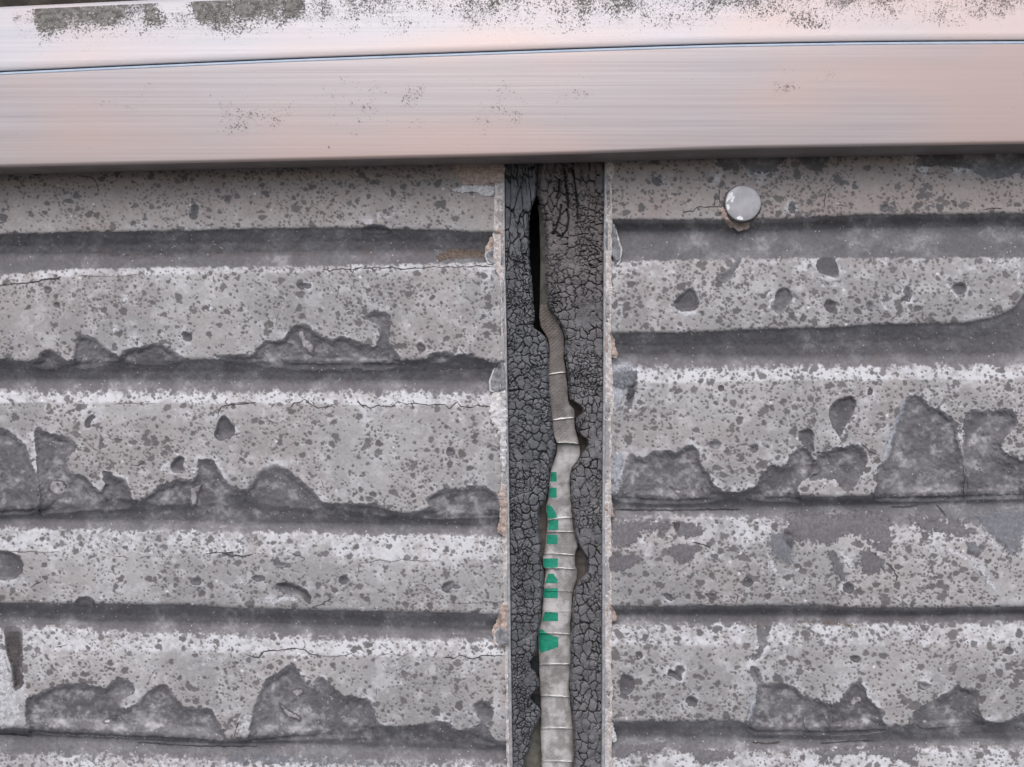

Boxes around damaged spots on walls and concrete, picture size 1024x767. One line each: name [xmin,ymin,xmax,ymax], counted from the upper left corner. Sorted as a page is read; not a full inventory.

crack [553,170,579,237]
spalling [0,335,187,371]
spalling [0,427,508,536]
spalling [605,395,1024,517]
spalling [4,626,226,741]
spalling [248,664,504,754]
spalling [747,619,887,740]
spalling [904,682,1024,735]